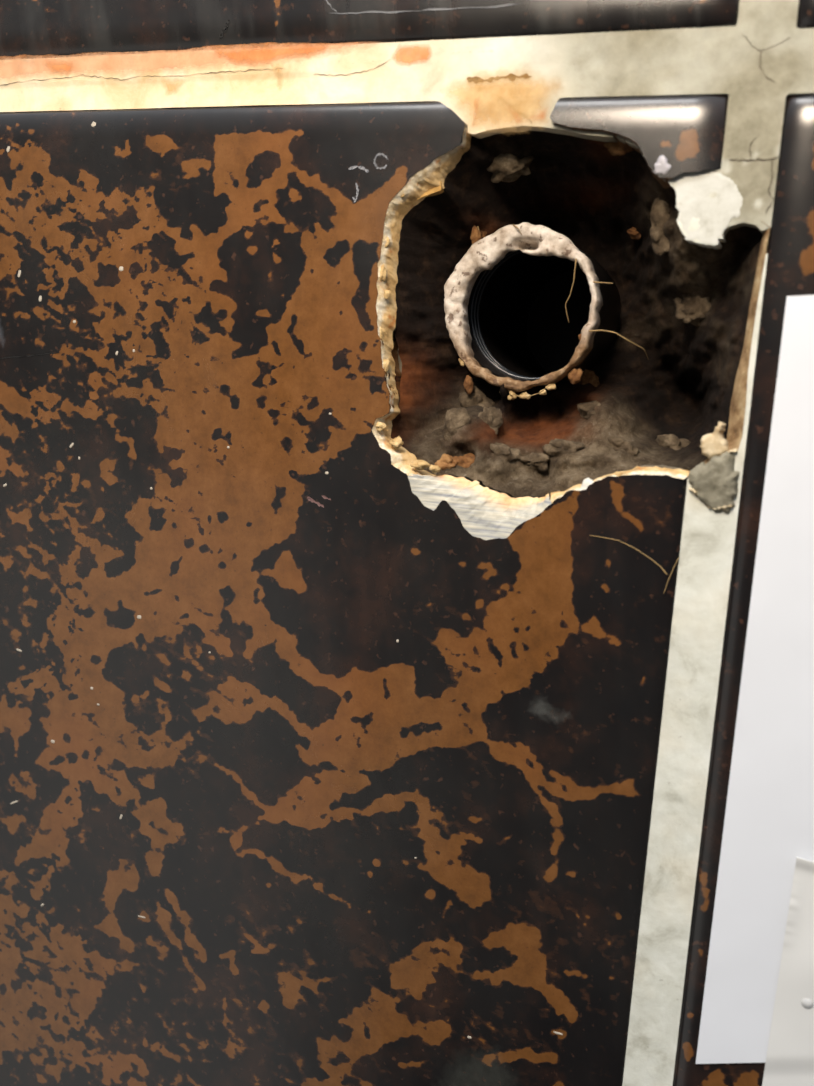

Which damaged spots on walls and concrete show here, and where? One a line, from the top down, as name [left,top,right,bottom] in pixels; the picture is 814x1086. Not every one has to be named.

corrosion [0,42,357,78]
corrosion [456,82,542,121]
spalling [372,123,770,540]